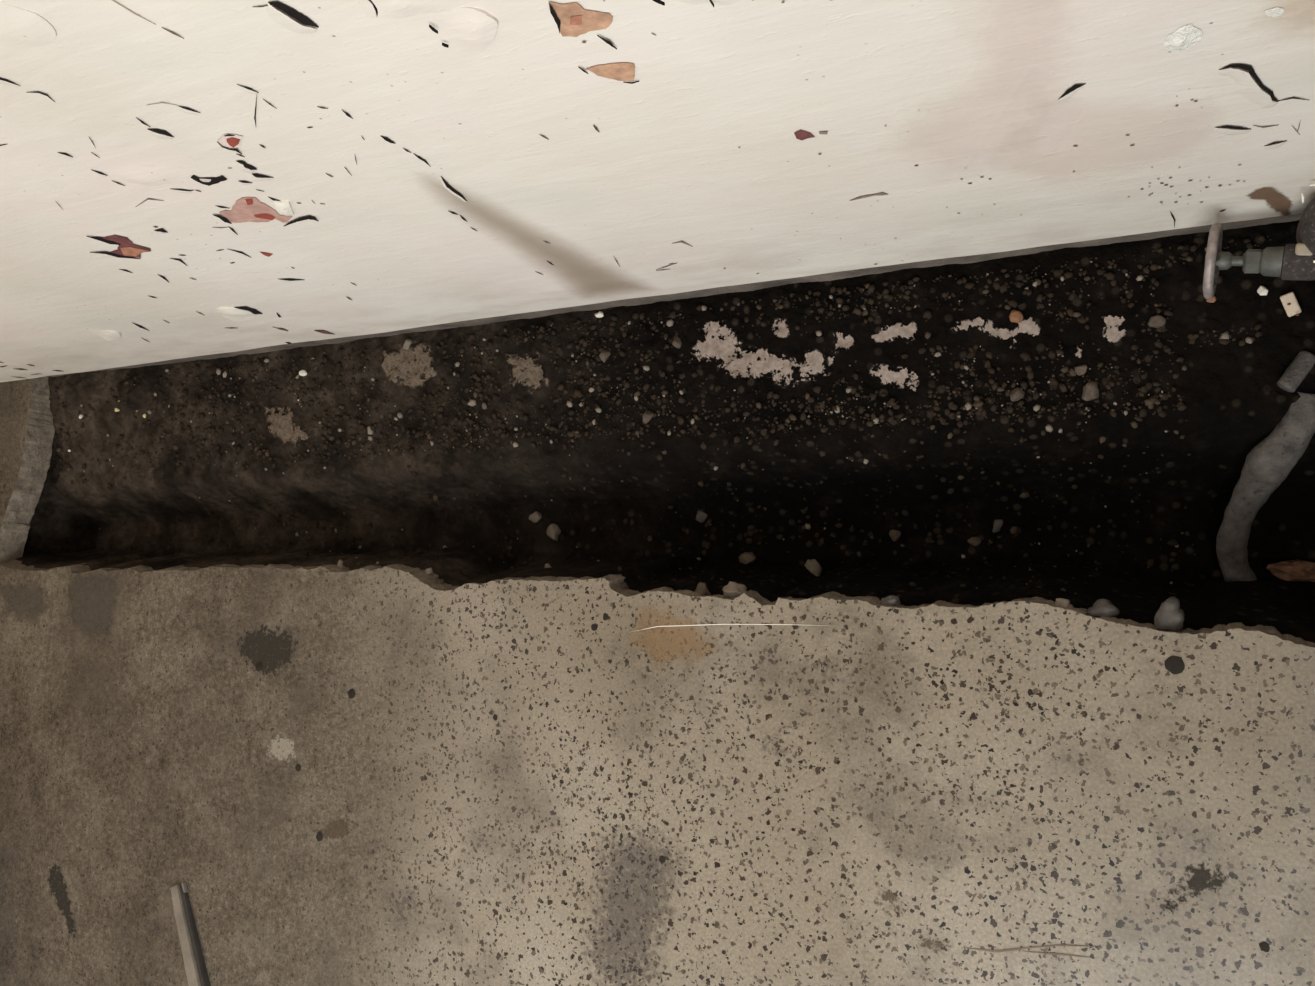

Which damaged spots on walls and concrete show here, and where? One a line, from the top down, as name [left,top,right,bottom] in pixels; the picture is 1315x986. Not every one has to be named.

crack [112,0,184,39]
crack [253,1,319,34]
crack [357,0,378,18]
peeling [549,1,639,84]
crack [1214,64,1308,149]
peeling [217,134,243,154]
peeling [191,175,227,186]
peeling [213,197,319,226]
crack [58,84,477,344]
peeling [86,235,151,259]
leakage [237,624,298,676]